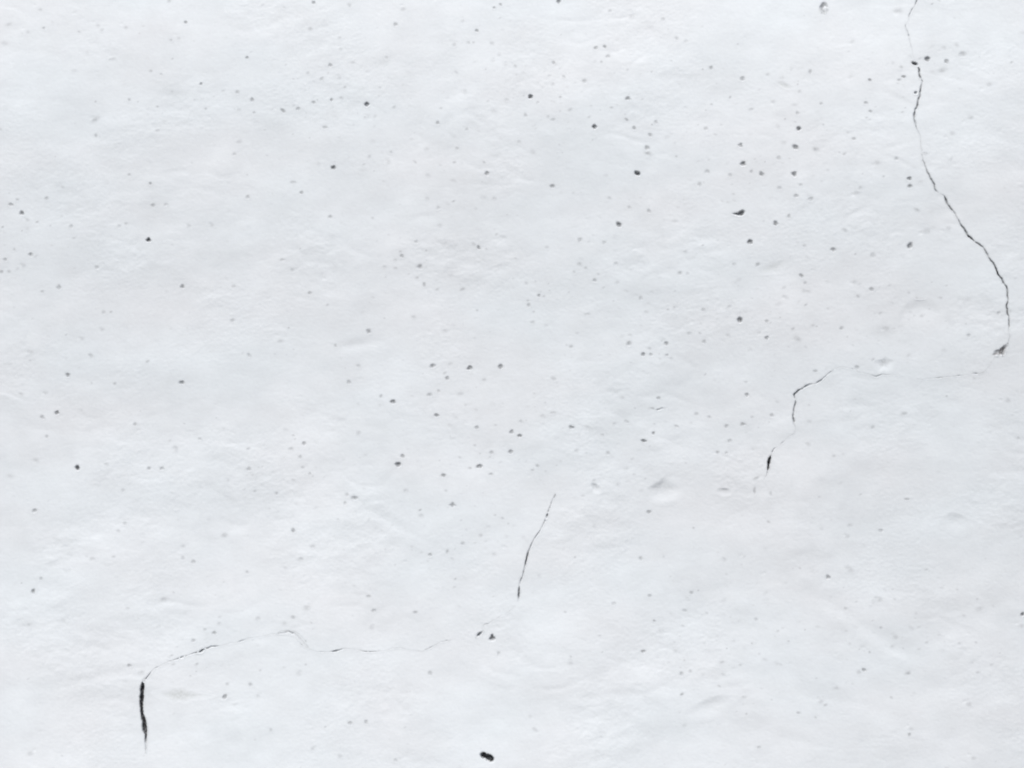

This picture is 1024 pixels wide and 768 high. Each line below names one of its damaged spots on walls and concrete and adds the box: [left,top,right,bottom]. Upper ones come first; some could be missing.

crack [763,0,1012,479]
crack [138,494,556,753]